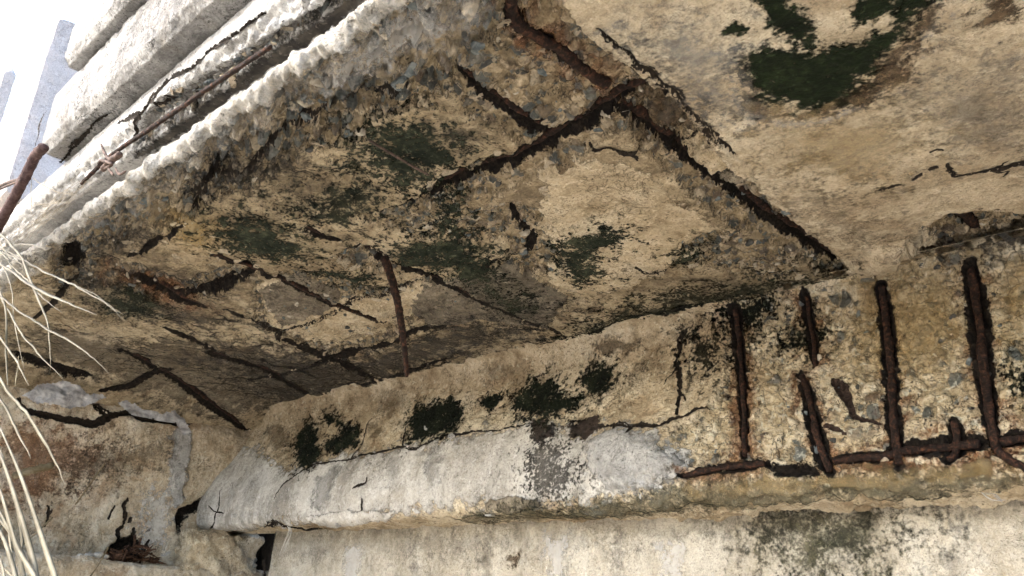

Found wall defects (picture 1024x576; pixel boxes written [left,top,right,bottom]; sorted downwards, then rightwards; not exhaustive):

crack [59,12,266,163]
leakage [739,4,943,132]
crack [876,149,1024,191]
leakage [89,226,159,258]
spalling [46,0,1024,478]
crack [16,397,191,429]
peeling [175,419,663,535]
leakage [507,415,602,516]
crack [524,302,716,432]
rust [677,329,764,486]
rust [792,374,847,435]
rust [831,378,882,426]